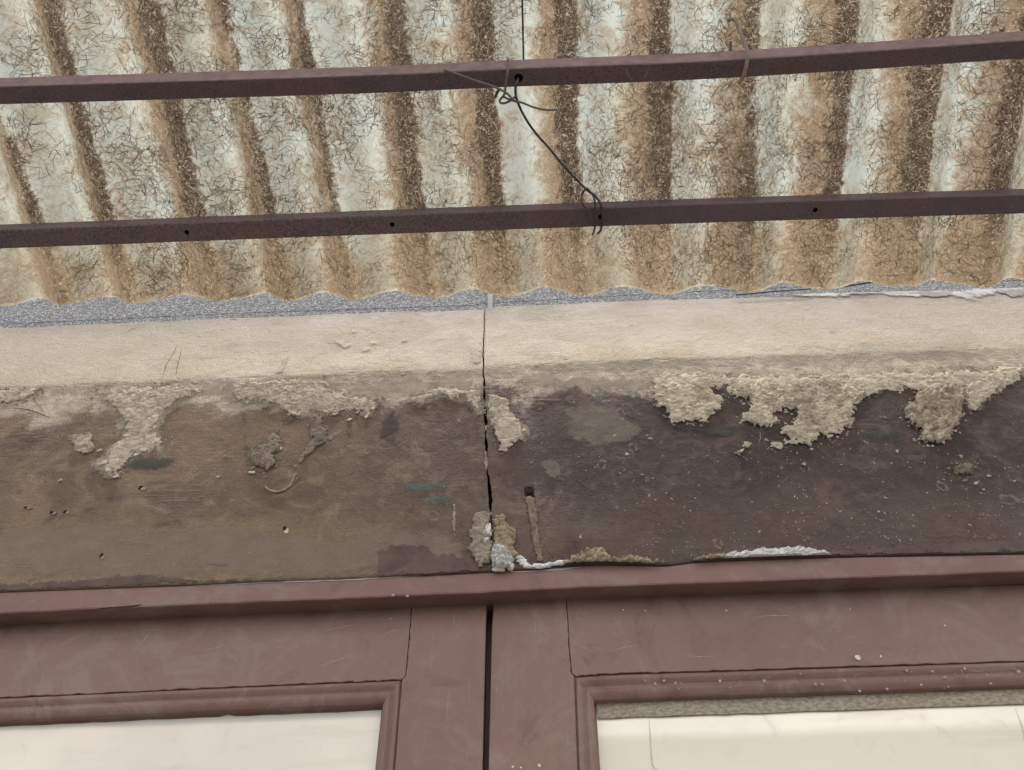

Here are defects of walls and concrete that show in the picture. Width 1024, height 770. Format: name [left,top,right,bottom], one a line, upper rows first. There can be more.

peeling [67,382,201,479]
peeling [223,375,386,478]
peeling [407,386,534,451]
crack [481,311,496,573]
spalling [649,363,1023,452]
spalling [947,462,979,482]
rust [525,487,544,561]
spalling [564,547,665,563]